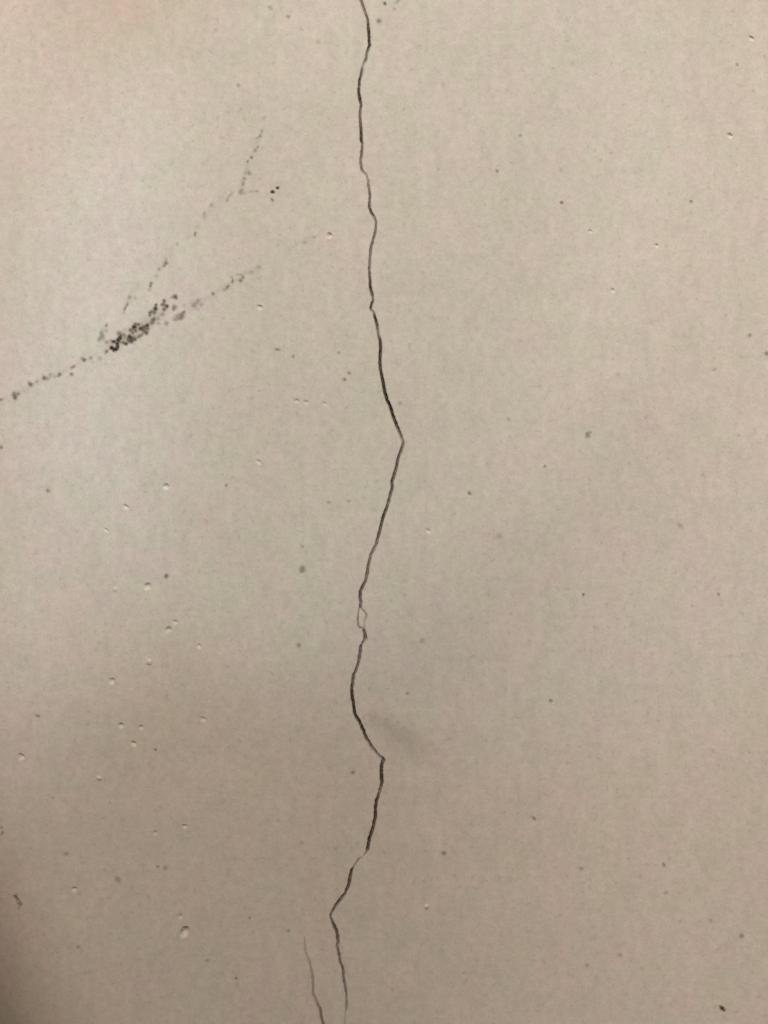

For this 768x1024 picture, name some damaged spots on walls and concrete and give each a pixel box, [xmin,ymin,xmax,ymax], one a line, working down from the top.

crack [304,0,404,1024]